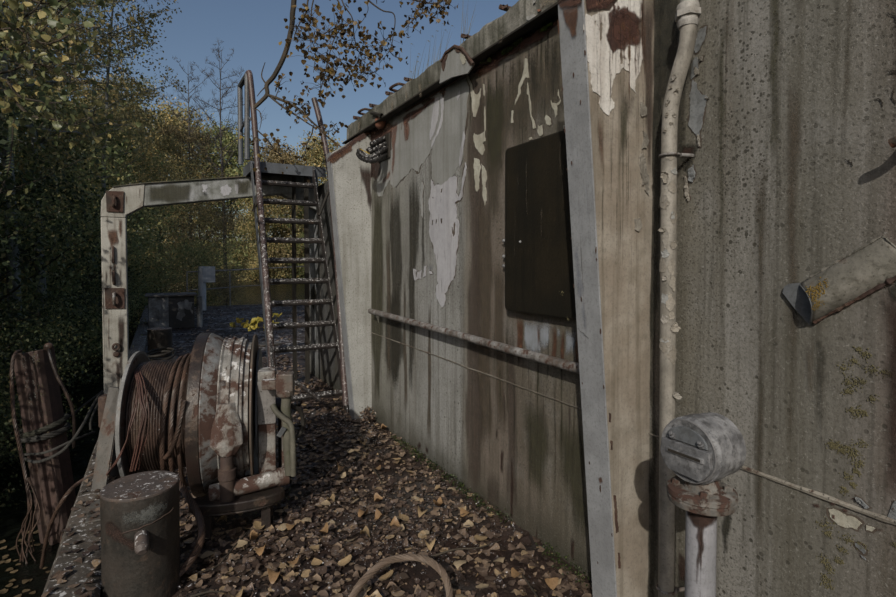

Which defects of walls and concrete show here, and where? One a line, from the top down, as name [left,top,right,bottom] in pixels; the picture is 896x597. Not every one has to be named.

peeling [511,58,566,141]
rust [441,0,654,155]
peeling [583,0,647,117]
peeling [663,25,709,148]
damp [770,0,778,110]
damp [371,188,424,399]
peeling [377,74,488,309]
damp [478,210,515,431]
damp [757,192,765,293]
damp [527,366,589,527]
peeling [826,494,878,563]